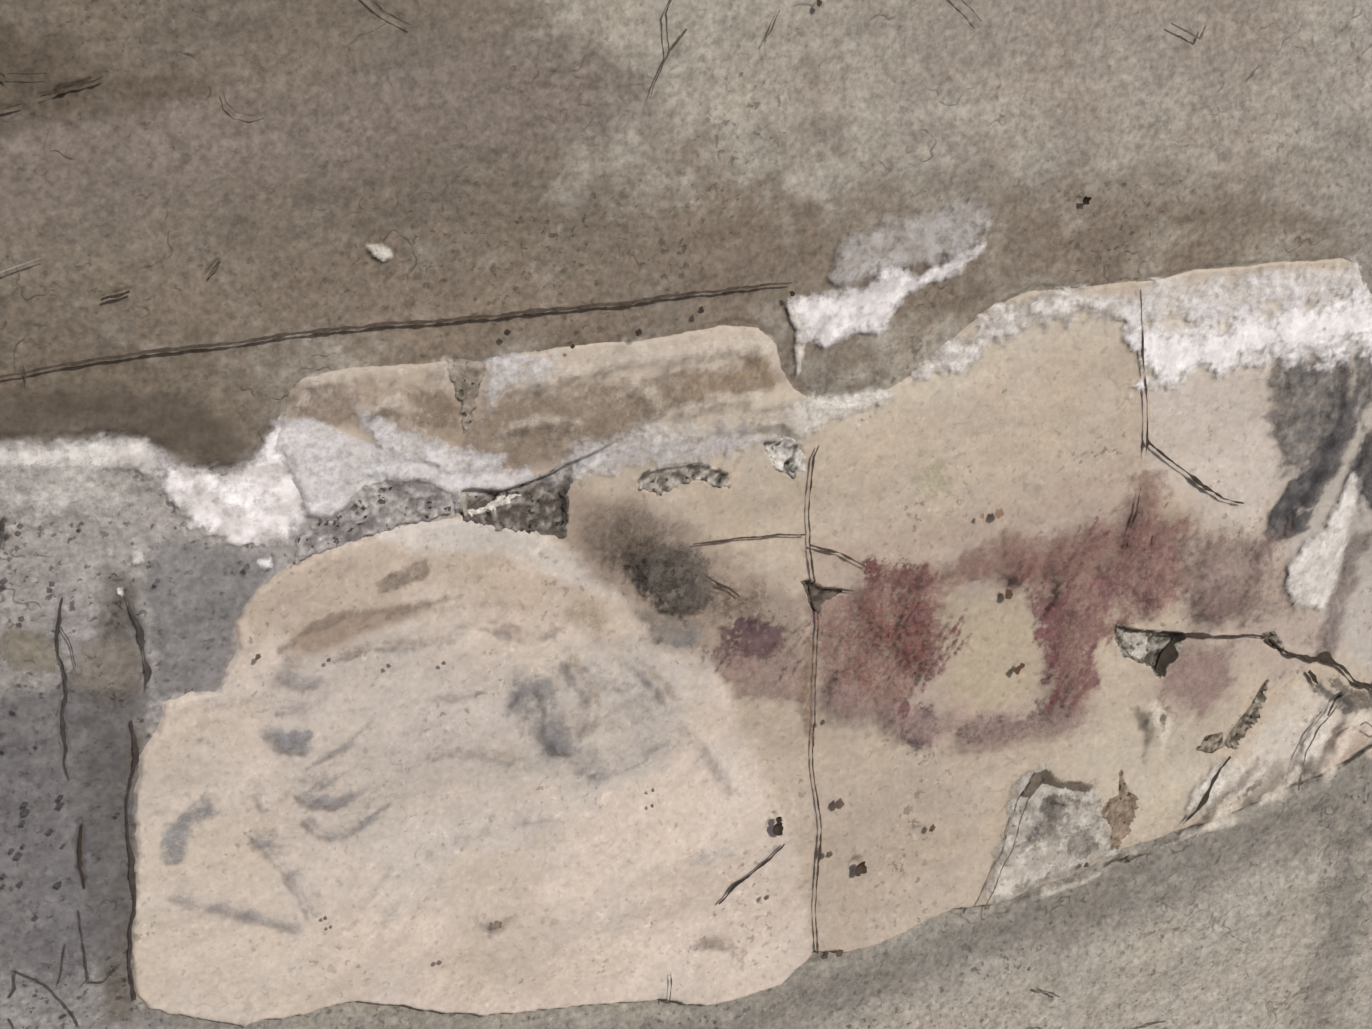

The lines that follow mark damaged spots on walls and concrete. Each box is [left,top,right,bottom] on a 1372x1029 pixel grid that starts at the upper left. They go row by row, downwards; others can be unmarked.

water stain [0,388,894,568]
flaking render [292,438,621,566]
water stain [487,353,558,404]
water stain [788,193,990,374]
water stain [912,264,1372,389]
crack [1140,289,1244,504]
crack [55,598,76,780]
crack [124,589,152,690]
crack [693,445,867,954]
crack [1156,631,1372,826]
crack [8,720,139,1029]
flaking render [985,764,1139,905]